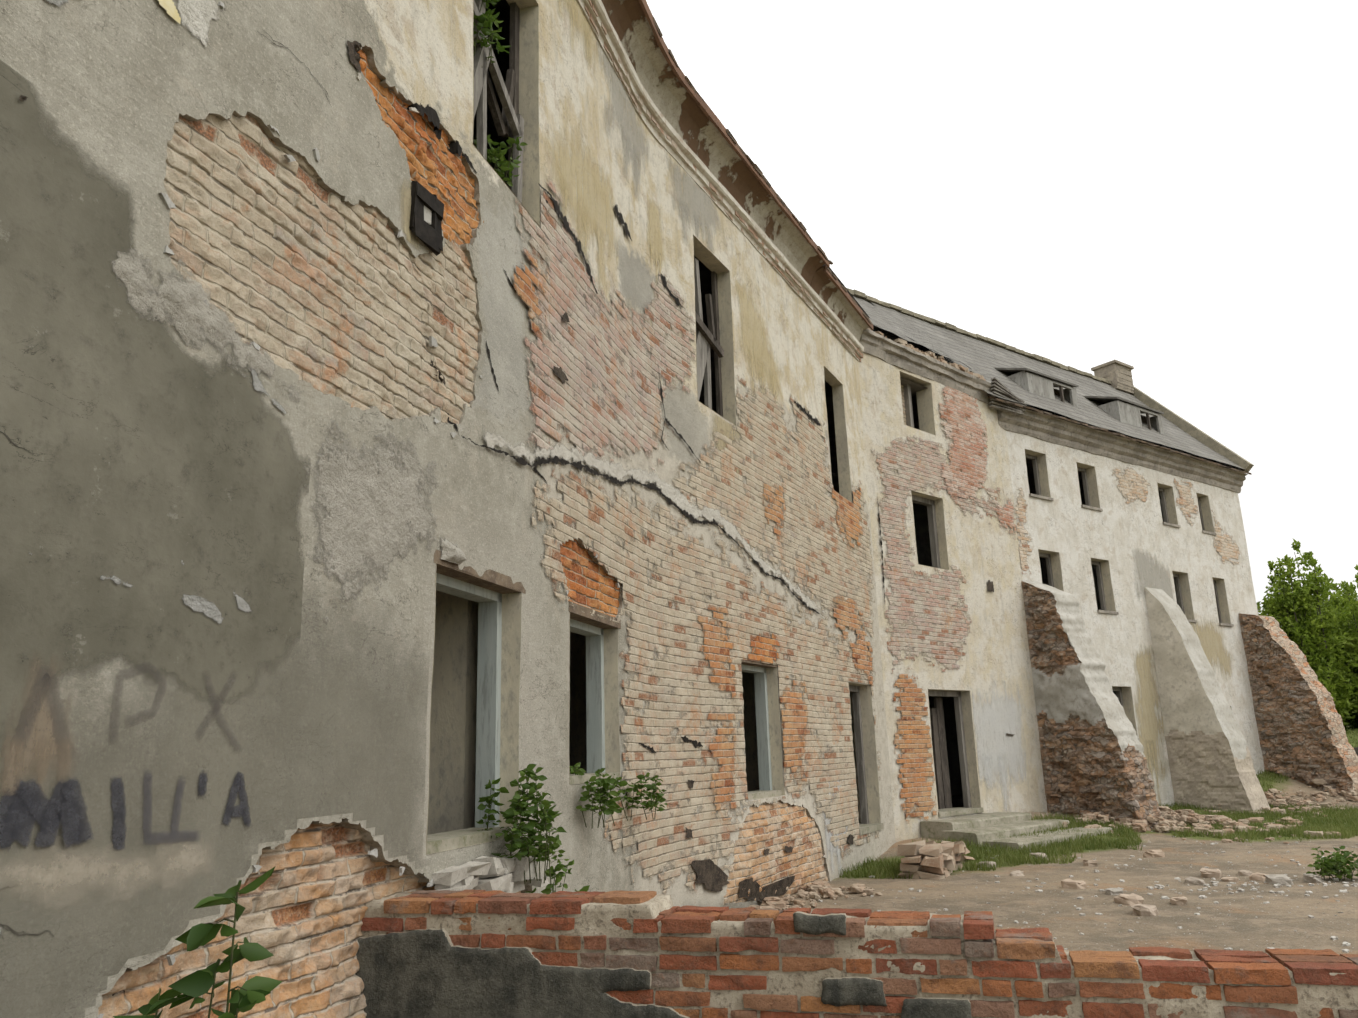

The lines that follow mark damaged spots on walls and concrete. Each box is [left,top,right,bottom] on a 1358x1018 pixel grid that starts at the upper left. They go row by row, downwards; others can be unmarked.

peeling [158,0,224,47]
spalling [158,48,484,438]
damp [0,60,418,1018]
crack [447,413,822,615]
spalling [513,176,1032,905]